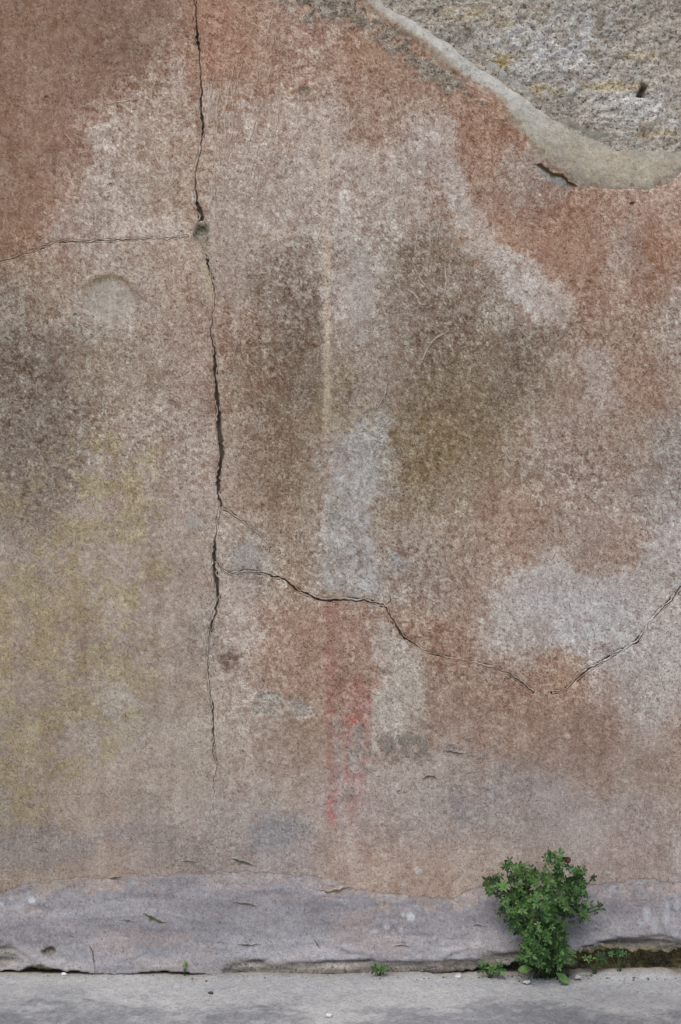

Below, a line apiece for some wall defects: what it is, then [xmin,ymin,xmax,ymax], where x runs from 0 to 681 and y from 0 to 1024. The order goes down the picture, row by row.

crack [0,0,681,818]